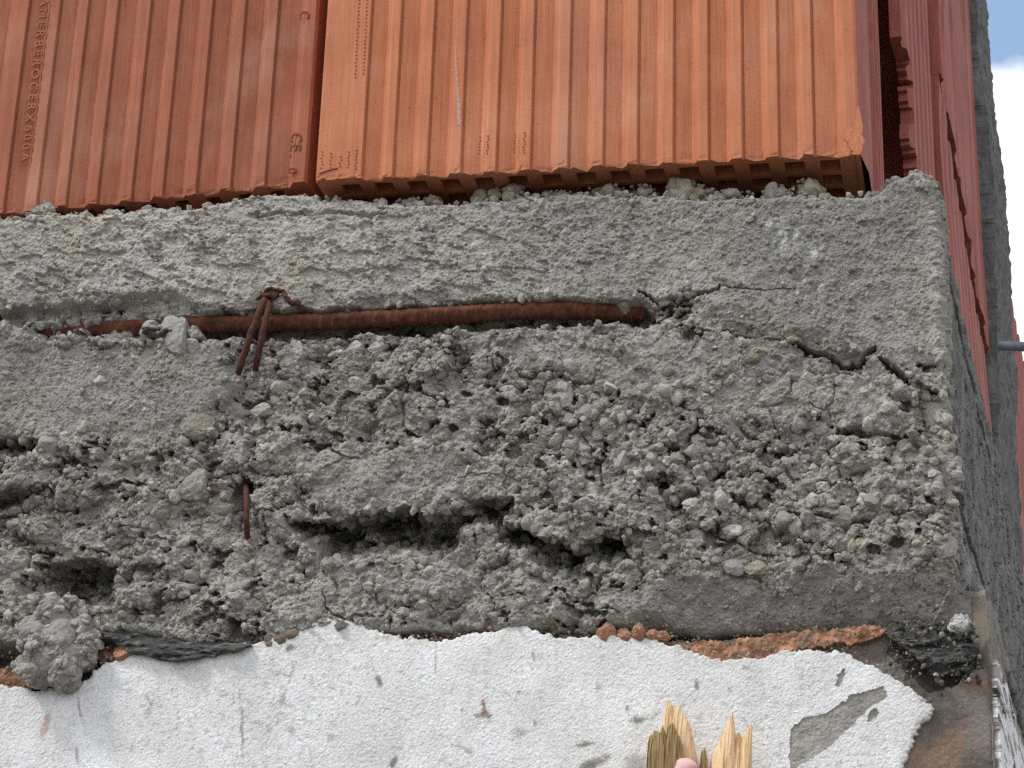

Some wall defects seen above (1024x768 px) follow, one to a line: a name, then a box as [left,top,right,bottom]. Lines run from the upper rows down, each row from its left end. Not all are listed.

spalling [26,295,657,344]
crack [637,283,796,308]
crack [722,328,913,442]